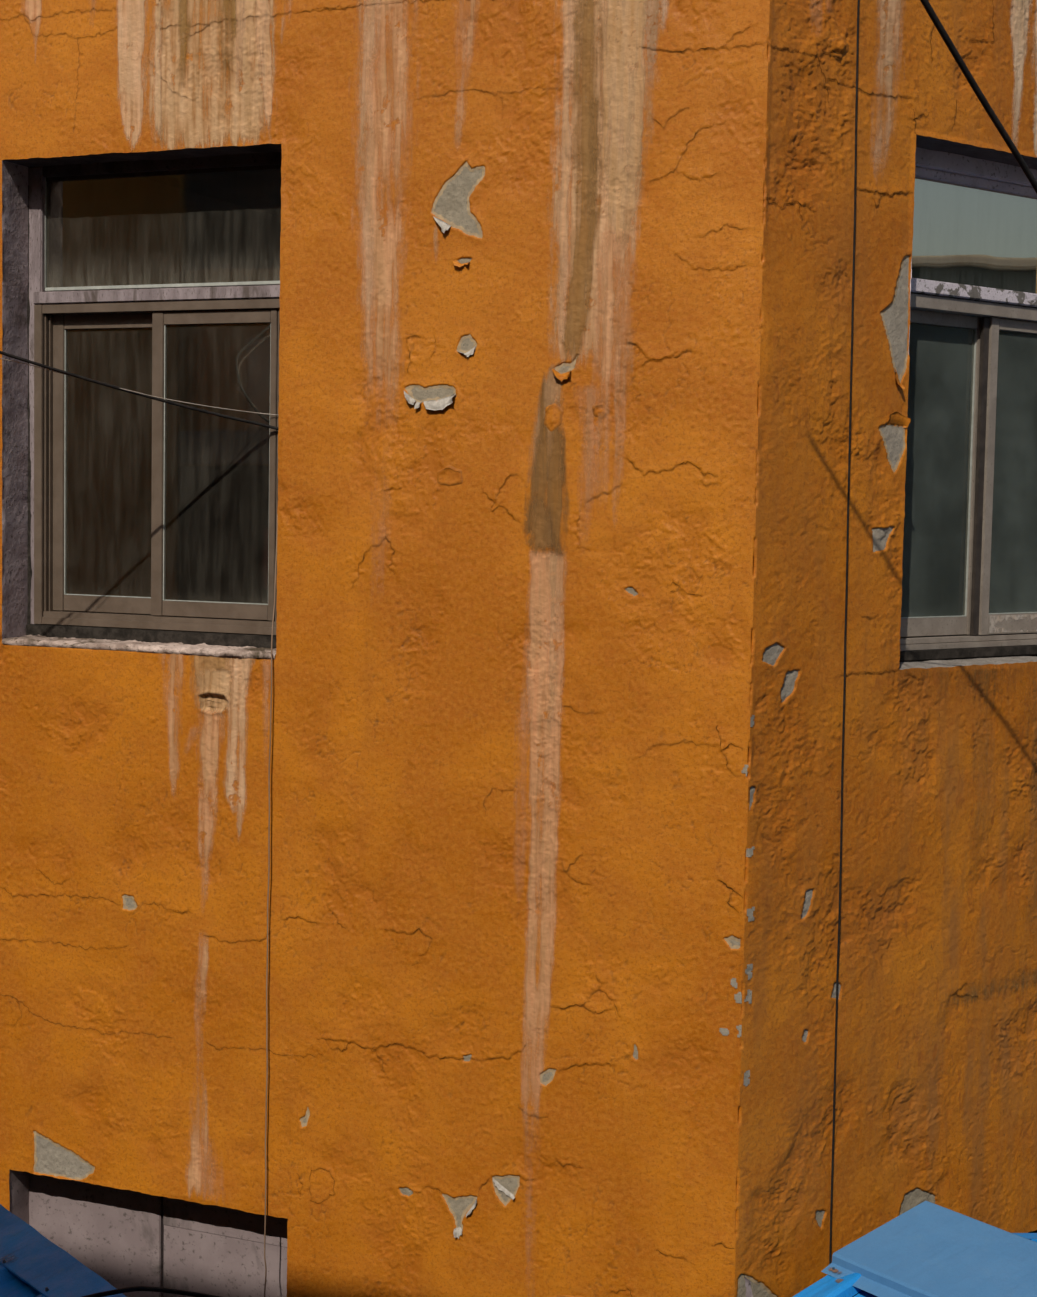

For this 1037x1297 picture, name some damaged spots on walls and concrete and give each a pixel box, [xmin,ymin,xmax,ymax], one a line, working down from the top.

damp [117,0,283,150]
damp [1010,0,1037,155]
peeling [432,161,485,239]
peeling [880,256,909,389]
peeling [404,385,456,410]
peeling [879,412,910,472]
damp [521,0,664,1116]
peeling [762,643,799,703]
damp [168,653,270,878]
peeling [33,1131,95,1180]
peeling [442,1194,477,1239]
peeling [492,1175,520,1206]